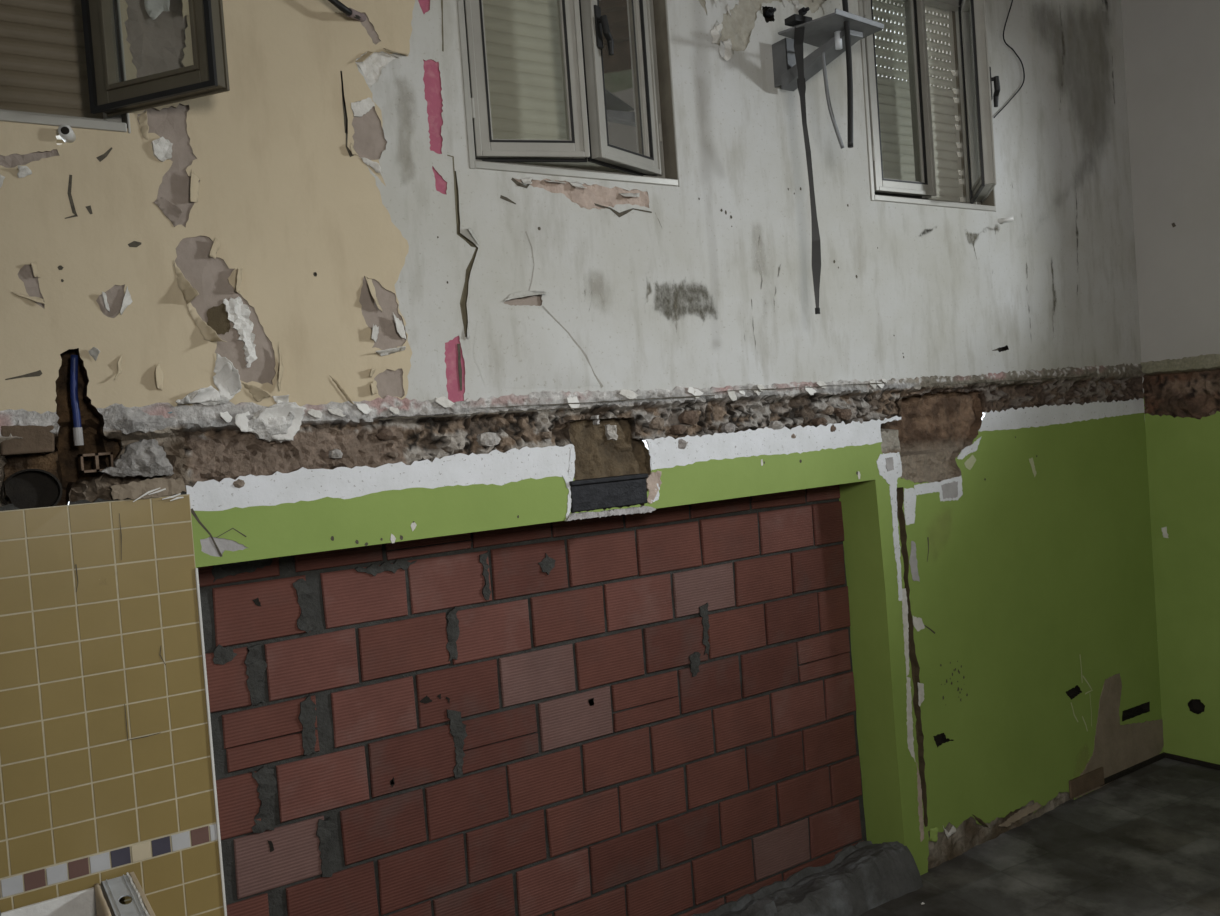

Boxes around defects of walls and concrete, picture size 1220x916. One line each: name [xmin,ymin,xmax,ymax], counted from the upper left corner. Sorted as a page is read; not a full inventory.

peeling [341,12,409,175]
peeling [423,59,447,194]
flaking render [699,0,832,61]
spalling [0,103,1220,509]
damp [648,284,716,319]
crack [889,486,935,841]
spalling [1066,655,1093,731]
flaking render [927,792,1074,869]